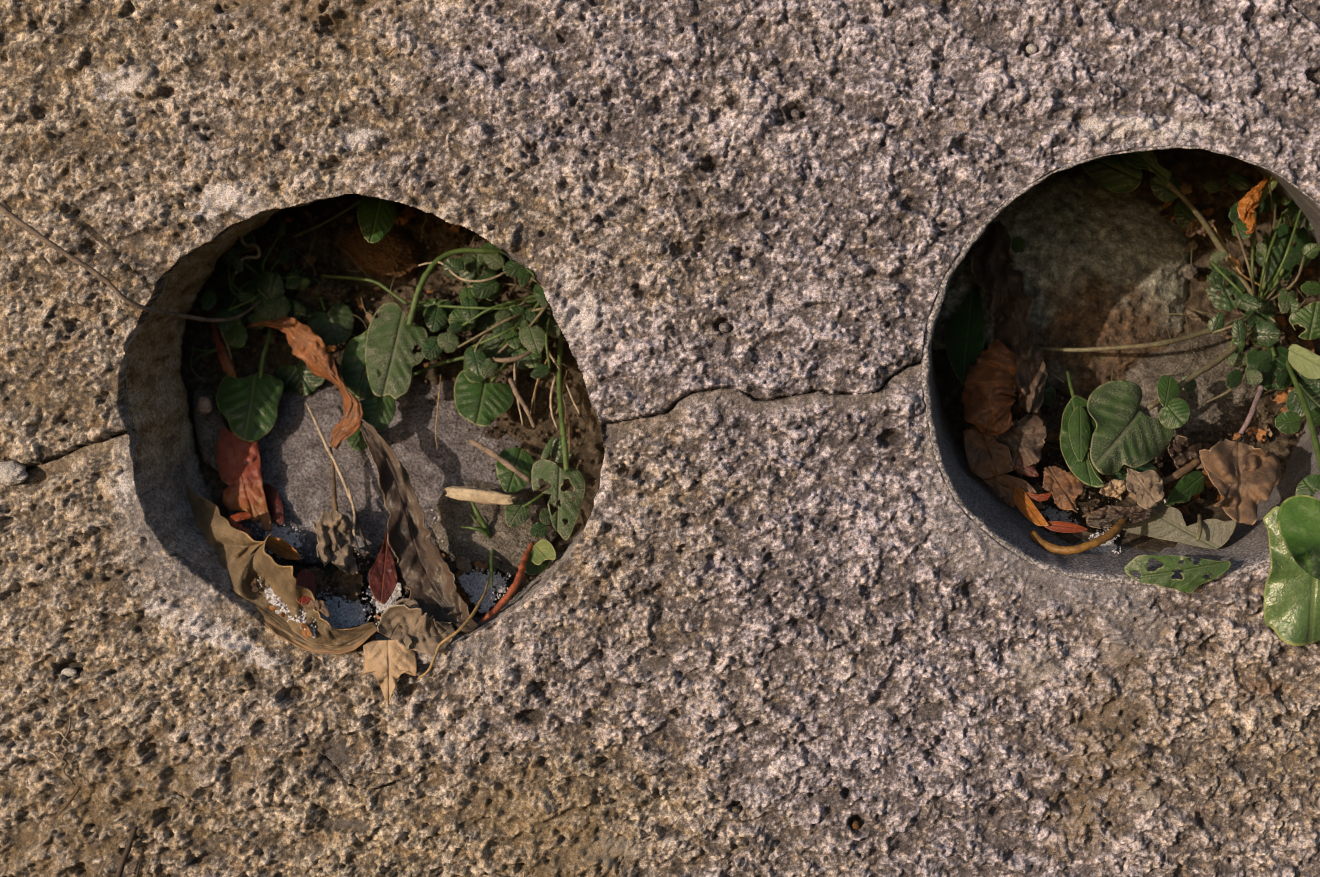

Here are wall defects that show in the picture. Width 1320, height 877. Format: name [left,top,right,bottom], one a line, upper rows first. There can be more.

crack [742,353,921,401]
crack [4,429,135,469]